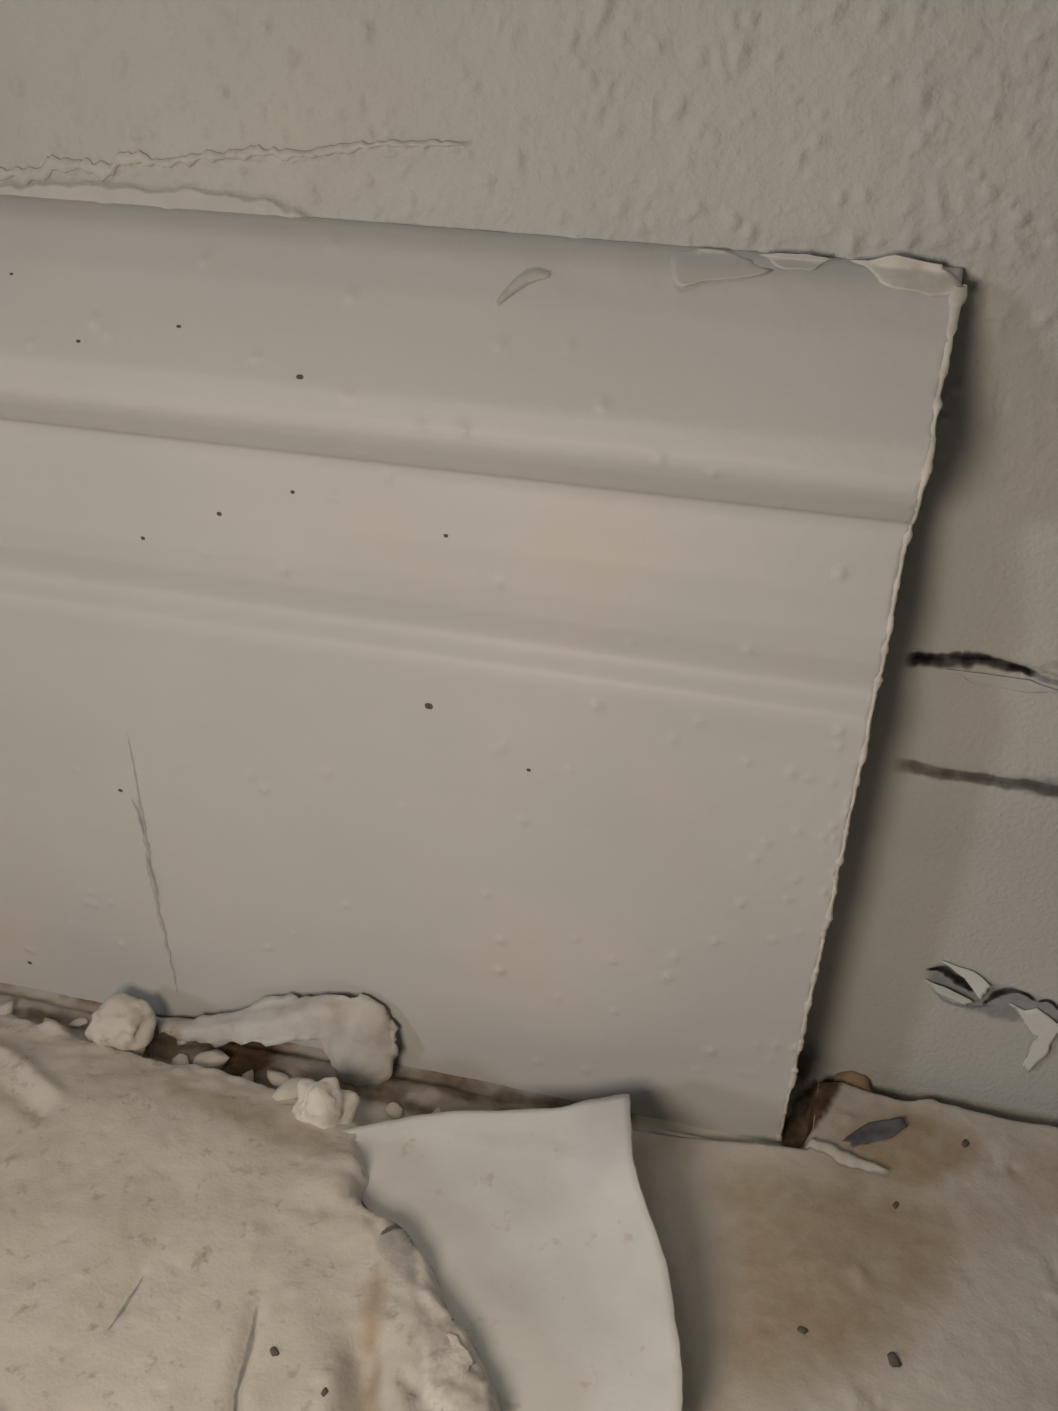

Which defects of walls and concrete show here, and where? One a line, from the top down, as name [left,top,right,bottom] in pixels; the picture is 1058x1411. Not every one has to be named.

peeling [849,255,962,297]
crack [910,652,1058,693]
crack [908,762,1058,796]
spalling [924,960,1058,1073]
damp [782,1081,840,1149]